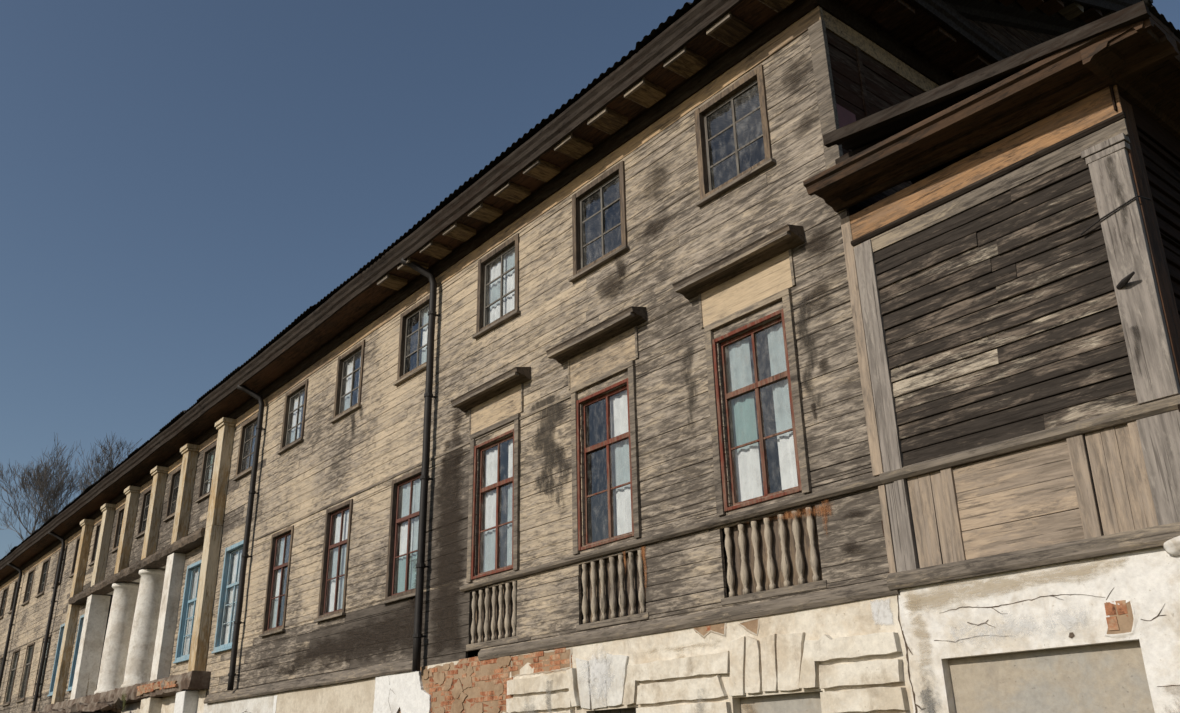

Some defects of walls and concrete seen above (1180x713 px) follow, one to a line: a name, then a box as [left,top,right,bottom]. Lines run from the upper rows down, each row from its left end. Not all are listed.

water stain [643,218,668,238]
water stain [531,395,568,501]
water stain [258,409,464,675]
flaking render [373,647,573,713]
crack [897,588,1114,713]
flaking render [1104,599,1138,638]